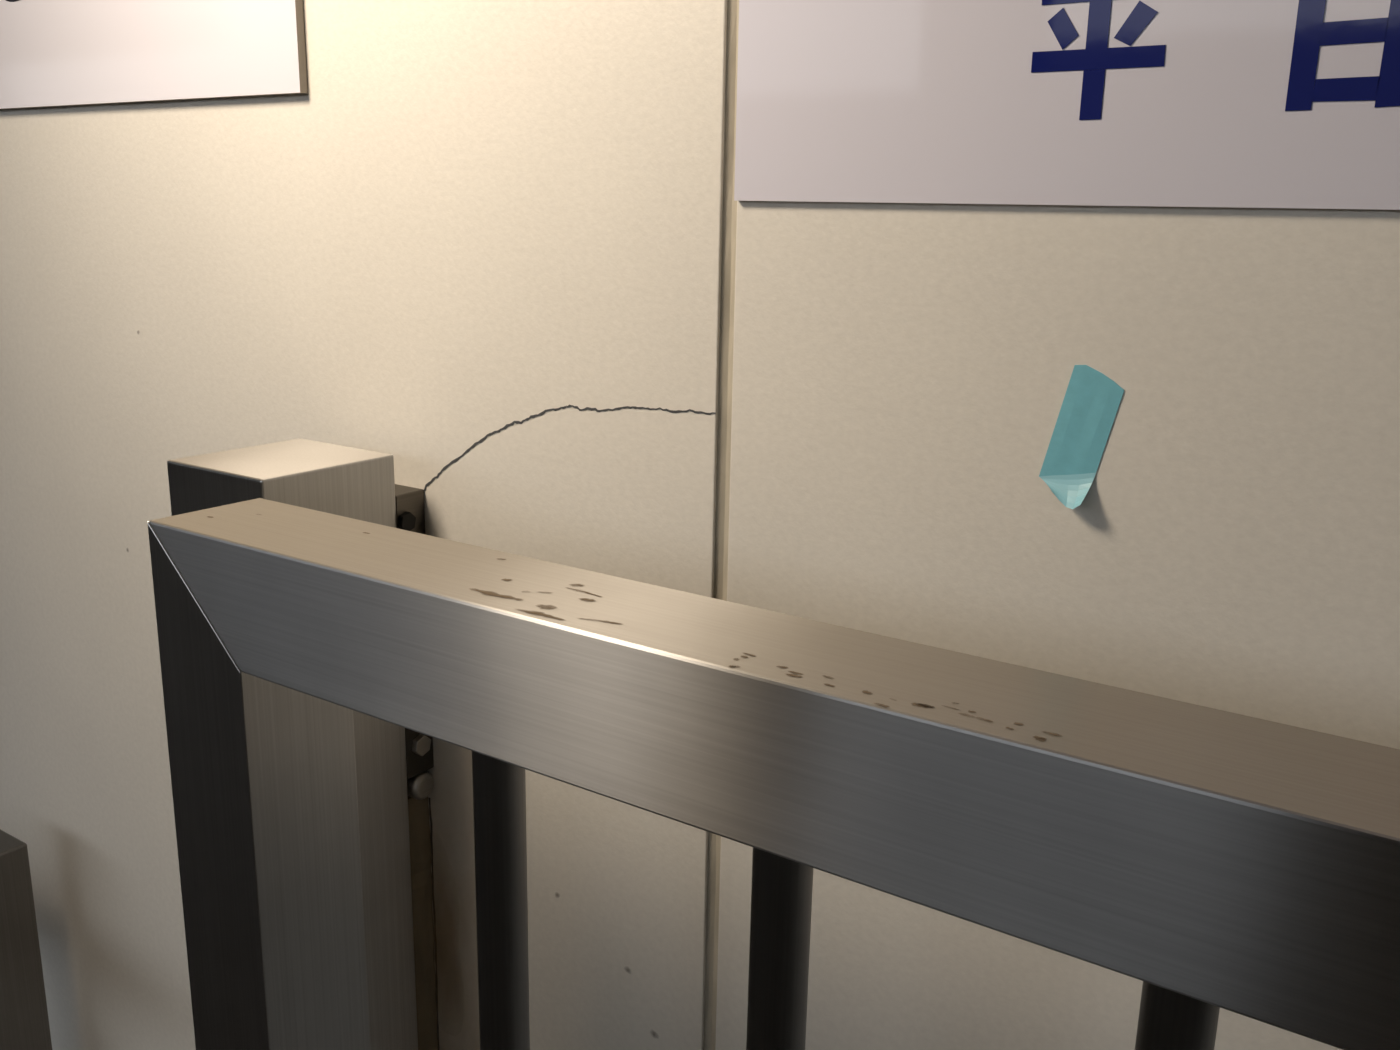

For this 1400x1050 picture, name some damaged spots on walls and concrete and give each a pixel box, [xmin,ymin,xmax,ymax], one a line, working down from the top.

crack [424,404,716,491]